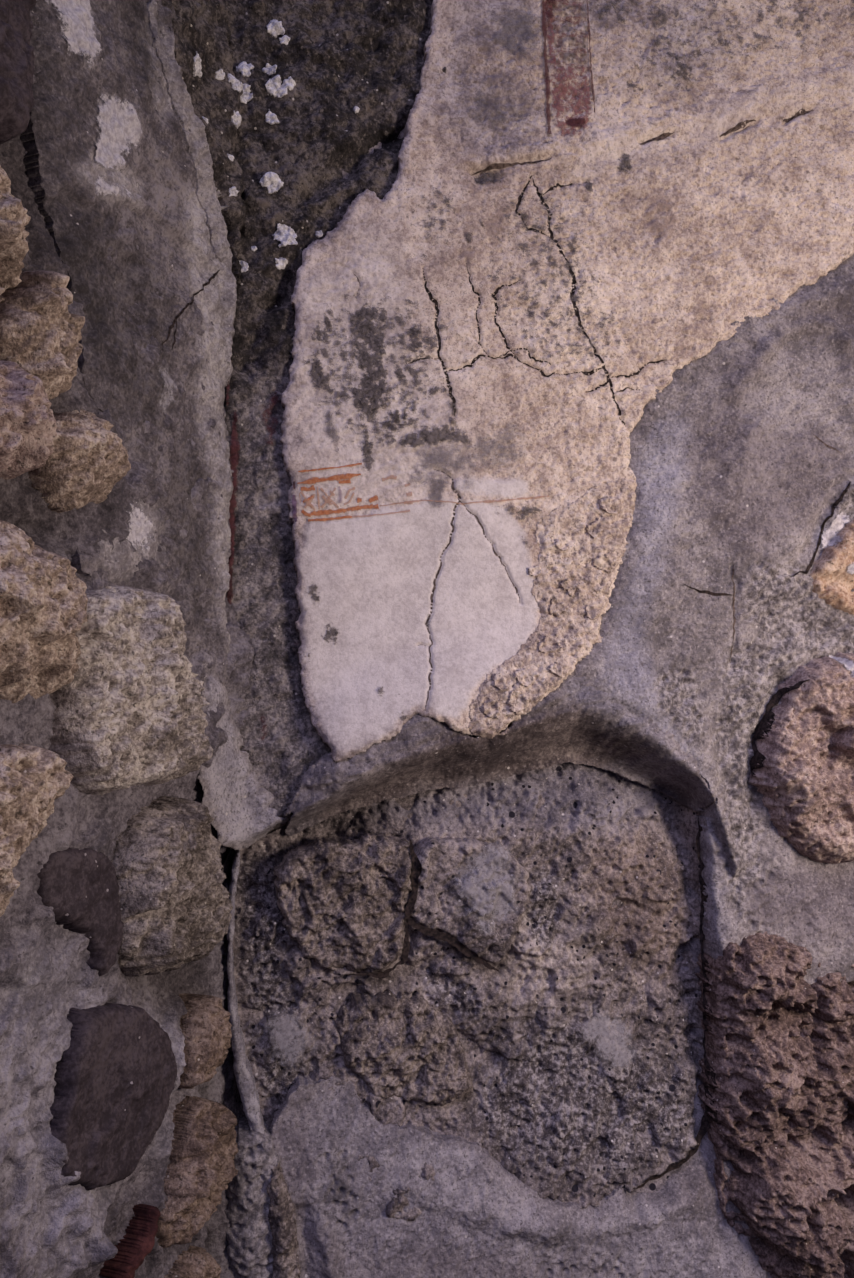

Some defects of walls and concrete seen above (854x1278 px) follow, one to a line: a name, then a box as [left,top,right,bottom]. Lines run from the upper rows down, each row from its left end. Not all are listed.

crack [408,158,664,425]
crack [422,469,520,709]
crack [793,482,851,576]